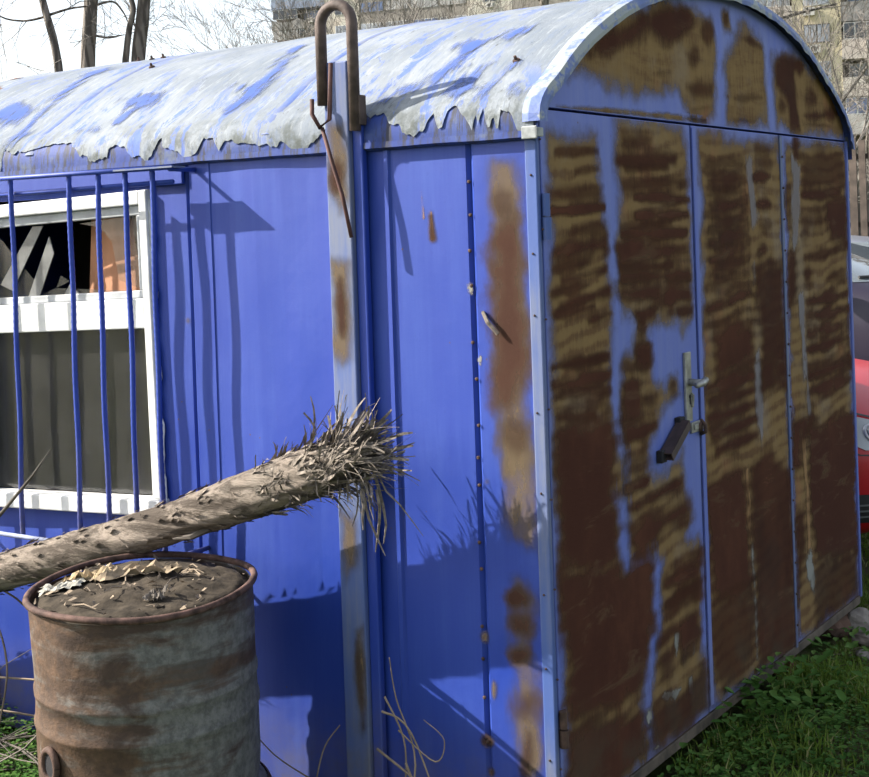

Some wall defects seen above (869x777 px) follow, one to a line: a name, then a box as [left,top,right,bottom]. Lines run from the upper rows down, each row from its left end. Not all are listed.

peeling [0,36,325,171]
peeling [326,32,347,63]
rust [328,125,347,206]
peeling [358,0,622,137]
rust [331,260,350,363]
rust [487,161,536,544]
rust [546,0,858,777]
rust [505,582,542,777]